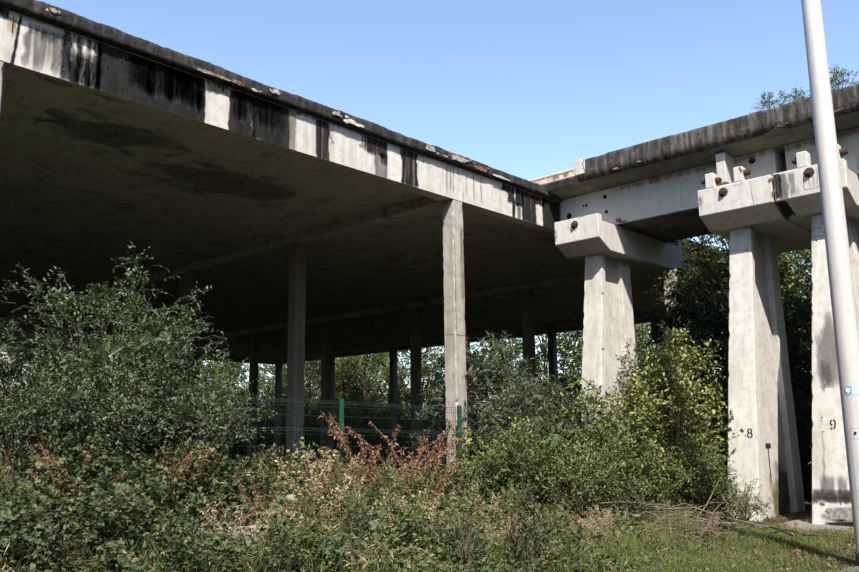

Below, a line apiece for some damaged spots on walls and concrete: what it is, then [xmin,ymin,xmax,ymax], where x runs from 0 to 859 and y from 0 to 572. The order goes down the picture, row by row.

damp [0,7,345,161]
spalling [332,111,364,128]
damp [358,133,388,178]
damp [400,149,428,187]
damp [489,180,560,230]
damp [817,316,839,389]
damp [812,478,851,504]